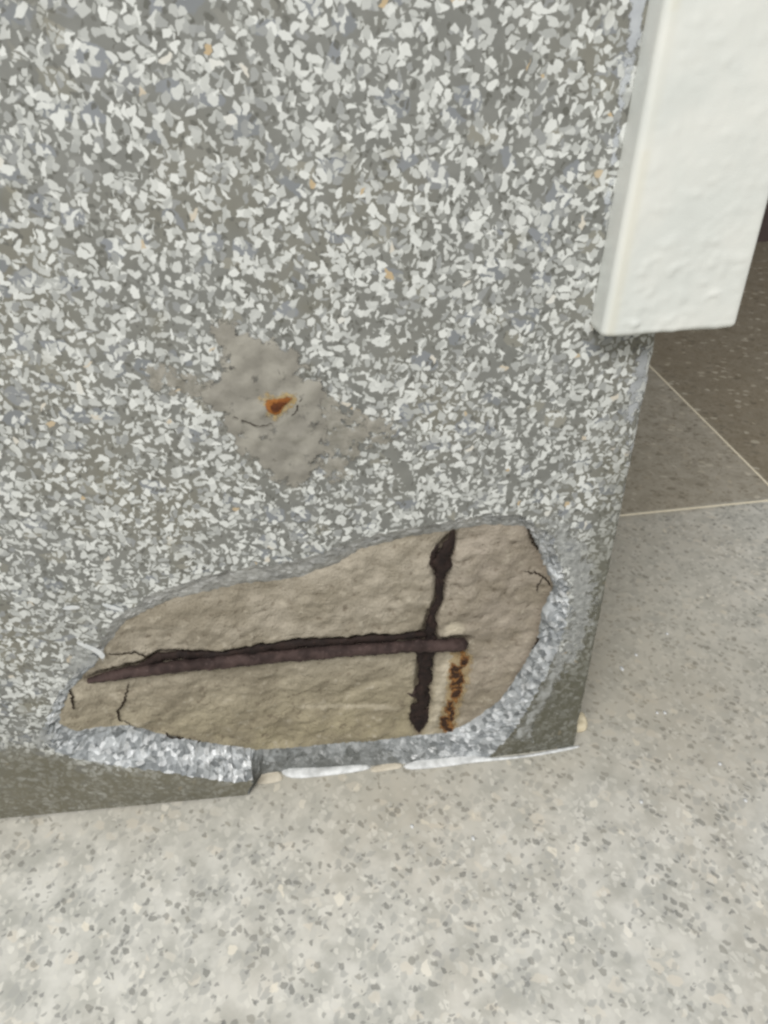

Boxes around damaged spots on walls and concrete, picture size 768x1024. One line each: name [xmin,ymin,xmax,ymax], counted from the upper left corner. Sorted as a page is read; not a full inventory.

corrosion [259,392,297,421]
crack [524,529,553,592]
spalling [42,513,569,794]
crack [116,682,135,729]
corrosion [440,651,470,734]